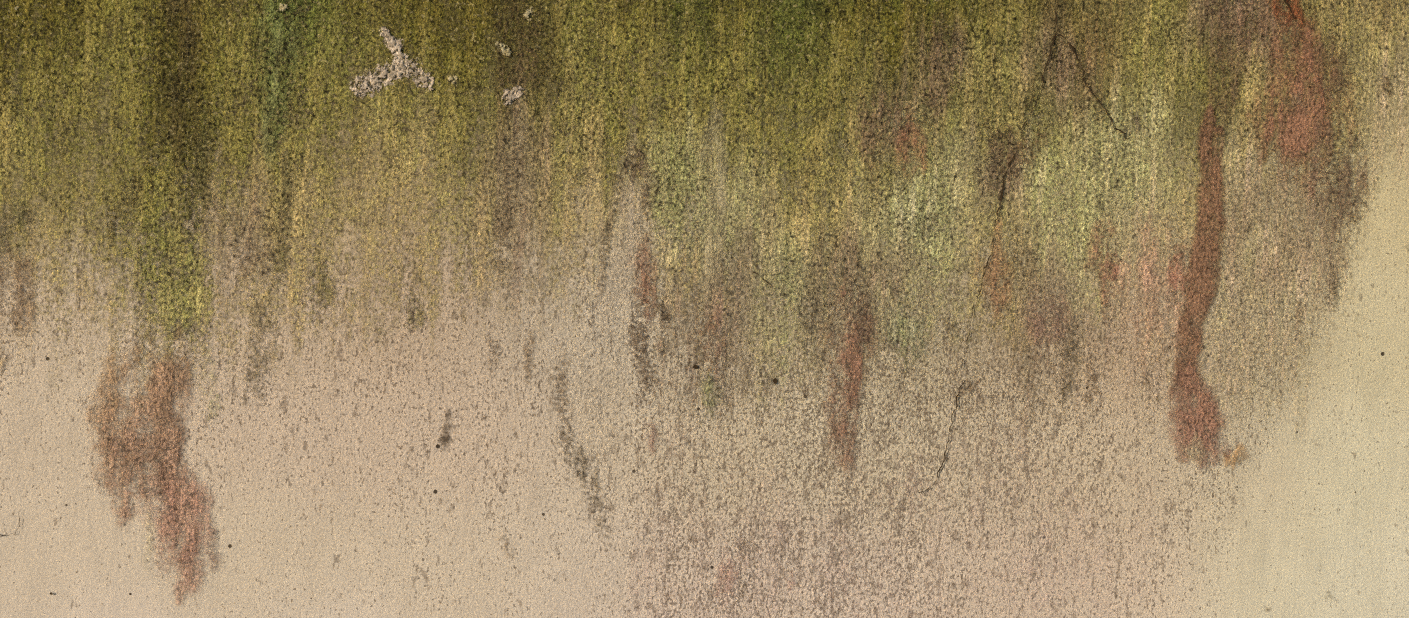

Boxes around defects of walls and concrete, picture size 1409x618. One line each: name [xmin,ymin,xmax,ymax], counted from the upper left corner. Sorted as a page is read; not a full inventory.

corrosion [88,357,214,603]
damp [108,0,215,338]
damp [233,0,298,278]
damp [552,98,729,526]
damp [891,170,952,257]
damp [980,125,1048,199]
crack [918,0,1125,493]
corrosion [1117,0,1366,467]